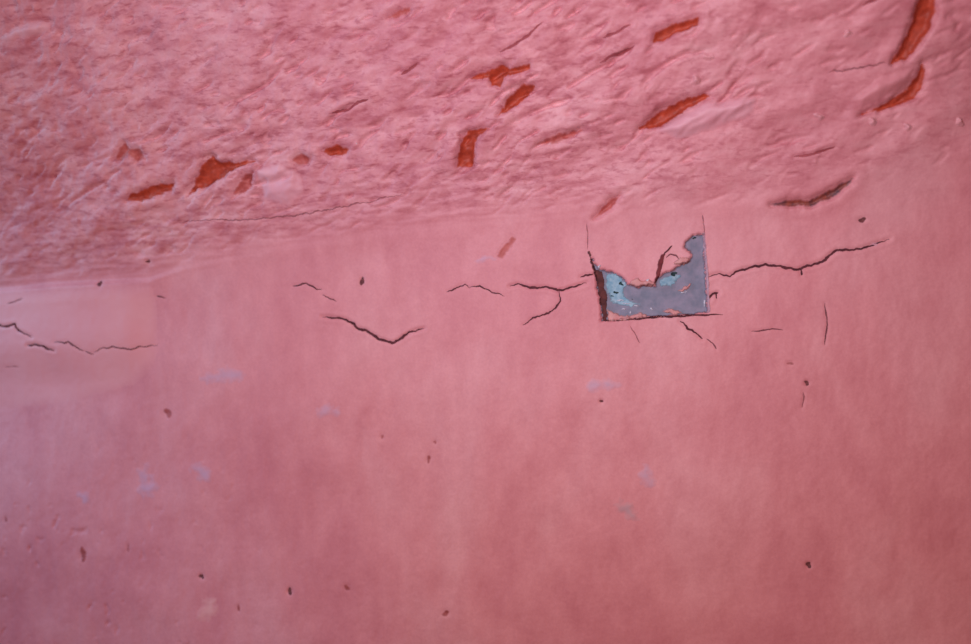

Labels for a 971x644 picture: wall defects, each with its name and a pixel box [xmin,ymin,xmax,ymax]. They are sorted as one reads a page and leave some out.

spalling [652,16,699,43]
spalling [890,0,937,64]
spalling [470,63,535,115]
spalling [638,93,710,130]
spalling [456,127,489,168]
spalling [188,155,256,195]
spalling [769,177,853,208]
crack [0,298,157,354]
crack [295,283,423,344]
crack [447,274,593,325]
spalling [587,233,722,321]
crack [709,239,888,299]